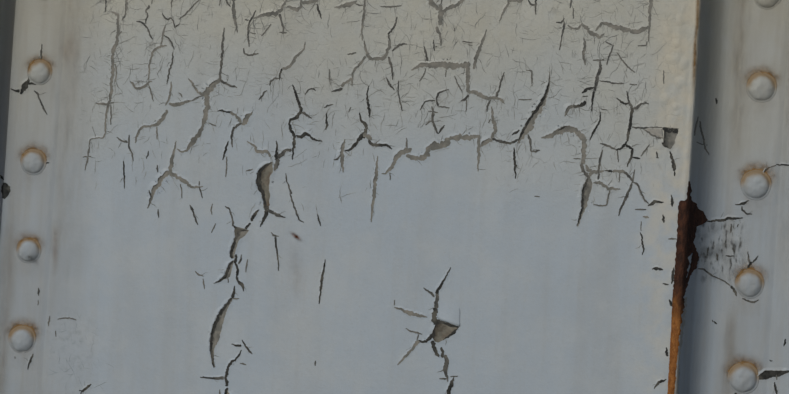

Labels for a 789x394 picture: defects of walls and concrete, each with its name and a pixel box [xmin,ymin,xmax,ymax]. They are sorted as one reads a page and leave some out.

peeling [10,77,47,115]
peeling [643,125,682,159]
peeling [0,175,14,199]
crack [80,0,678,394]
corrosion [667,181,708,394]
peeling [758,360,789,394]